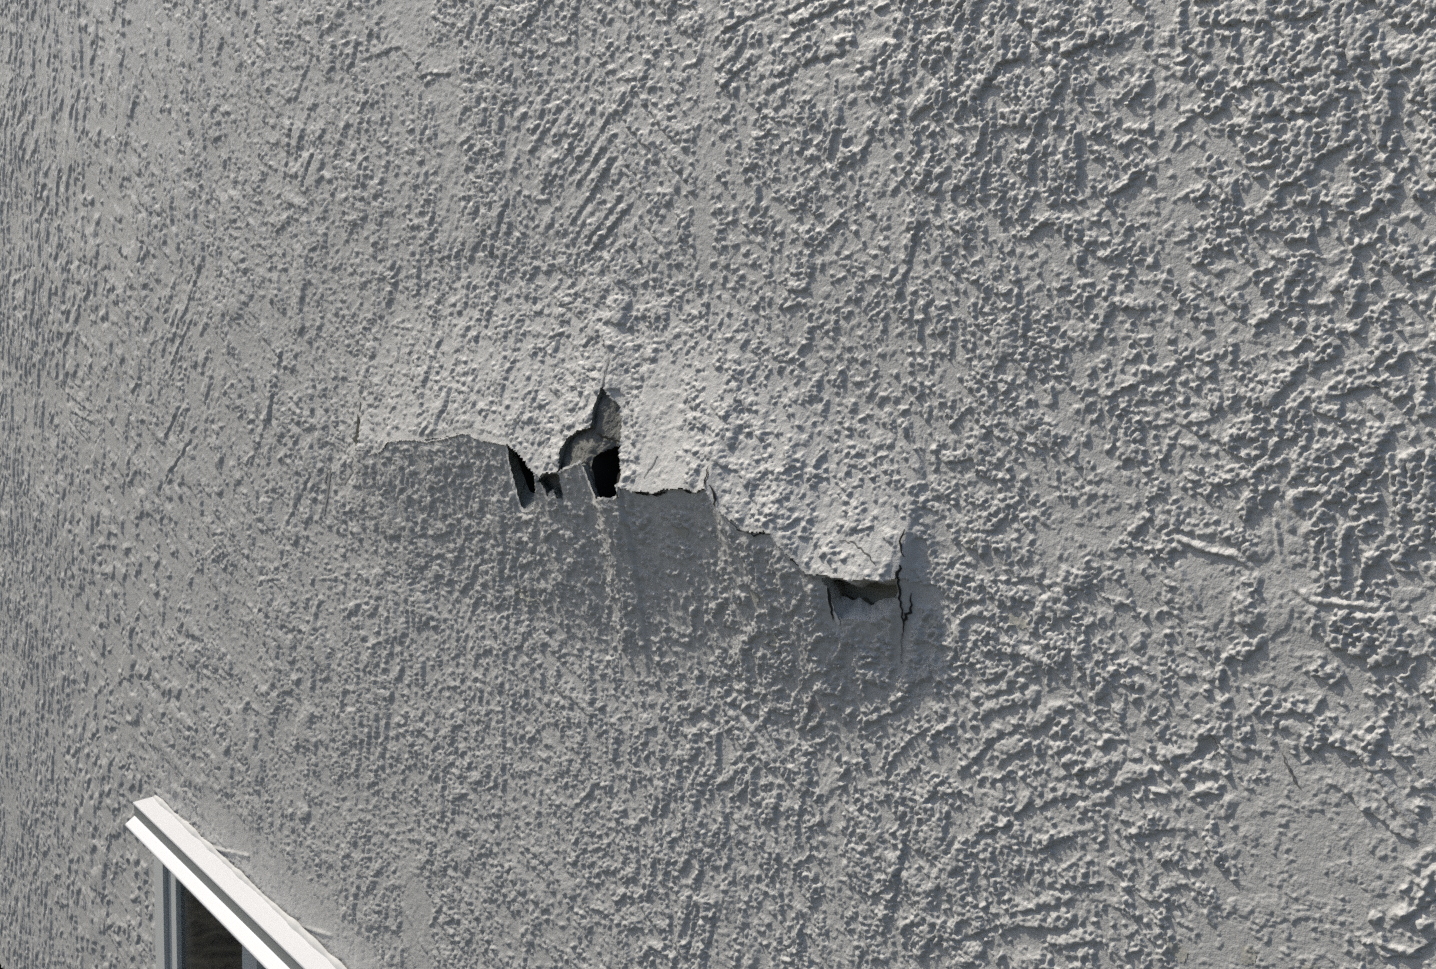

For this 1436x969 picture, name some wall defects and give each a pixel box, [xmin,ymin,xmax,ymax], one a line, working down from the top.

spalling [506,386,622,513]
spalling [821,577,898,625]
crack [839,529,912,664]